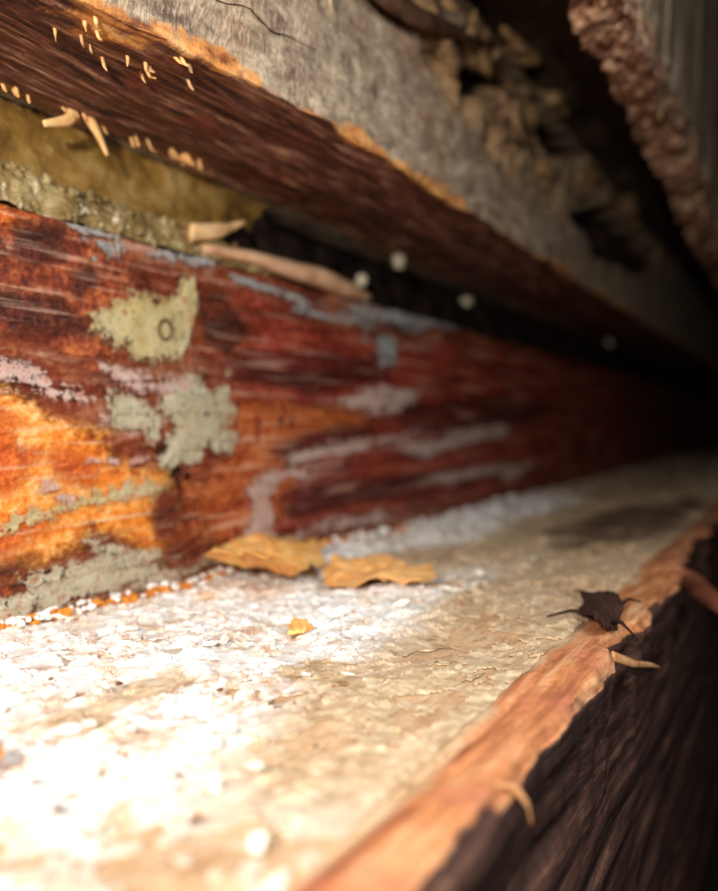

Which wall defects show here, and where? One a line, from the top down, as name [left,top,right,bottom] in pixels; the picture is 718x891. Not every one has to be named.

crack [217,0,315,51]
spalling [0,160,461,536]
corrosion [0,204,625,607]